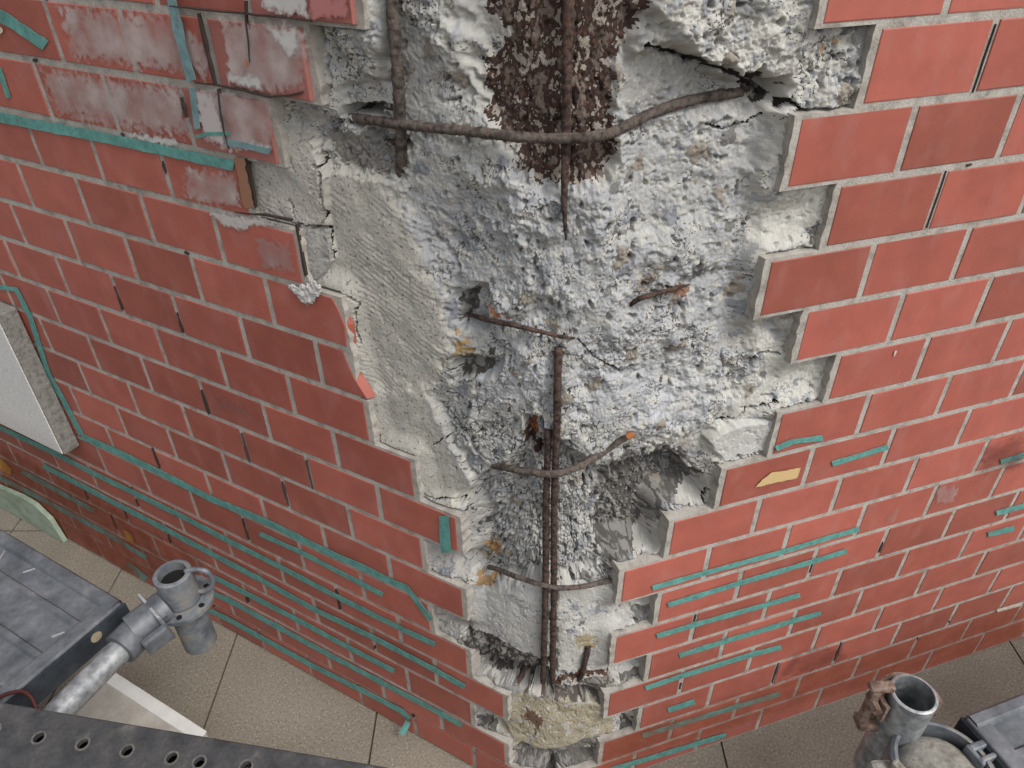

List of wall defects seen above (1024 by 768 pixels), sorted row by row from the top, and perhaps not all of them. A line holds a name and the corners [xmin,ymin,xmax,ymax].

efflorescence [59,6,172,69]
efflorescence [54,71,184,146]
crack [169,1,337,276]
efflorescence [186,0,348,152]
corrosion [482,0,650,186]
crack [644,42,807,130]
efflorescence [187,167,282,231]
peeling [250,0,869,705]
corrosion [521,414,545,453]
corrosion [514,664,609,698]
spalling [476,707,502,732]
spalling [512,713,634,768]